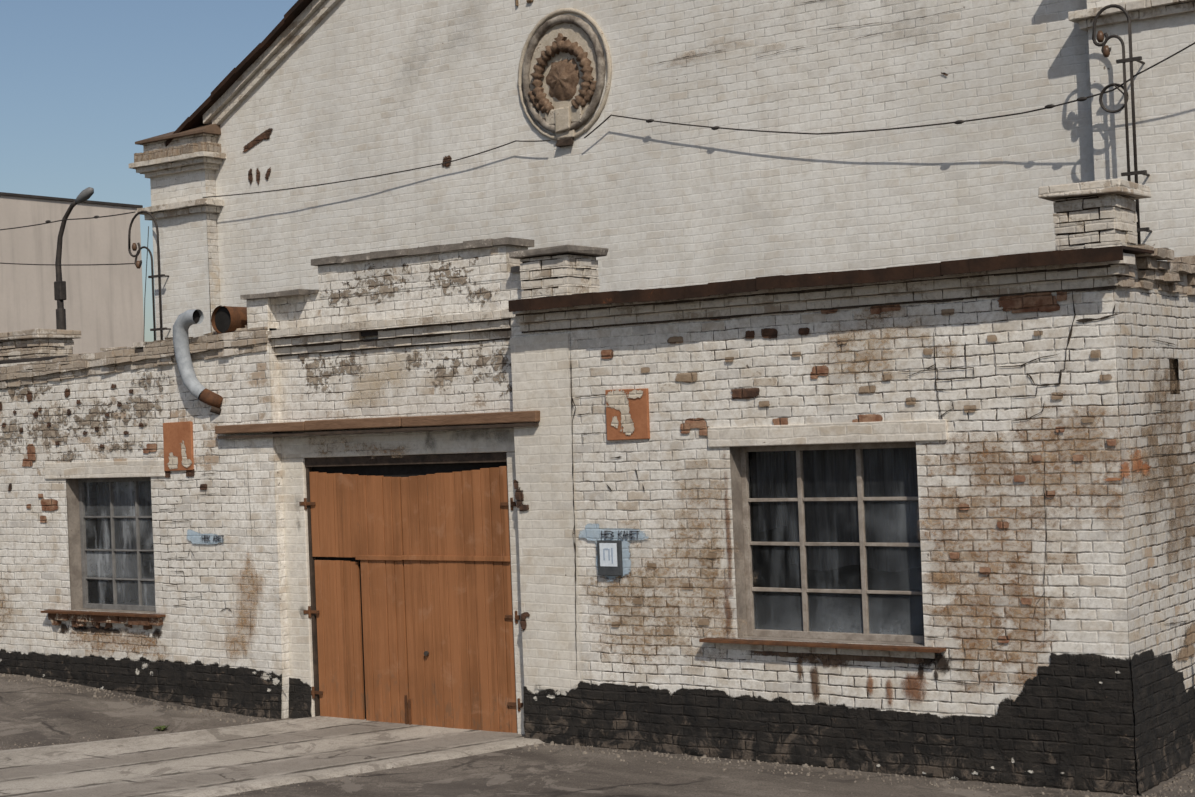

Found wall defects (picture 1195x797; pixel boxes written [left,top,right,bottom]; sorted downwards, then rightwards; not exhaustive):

peeling [320,255,500,309]
peeling [0,367,207,490]
peeling [297,350,367,395]
peeling [400,340,513,398]
crack [900,279,1118,440]
leakage [751,367,1195,701]
crack [1032,476,1047,648]